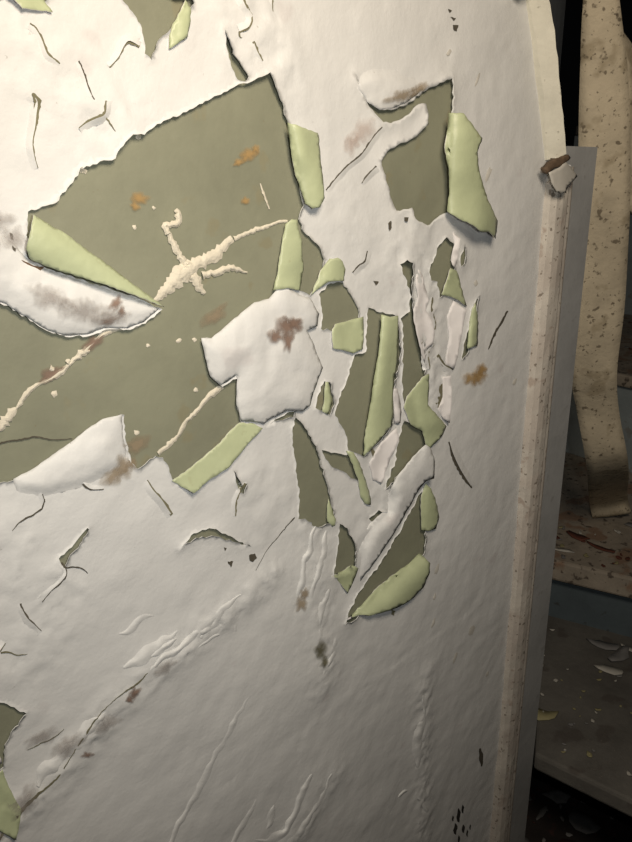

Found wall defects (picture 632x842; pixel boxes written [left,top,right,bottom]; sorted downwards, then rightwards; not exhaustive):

peeling [14,0,53,12]
peeling [123,0,191,58]
crack [236,0,263,62]
peeling [0,45,498,621]
rust [269,319,302,349]
rust [467,366,487,383]
crack [448,440,475,488]
peeling [0,703,25,840]